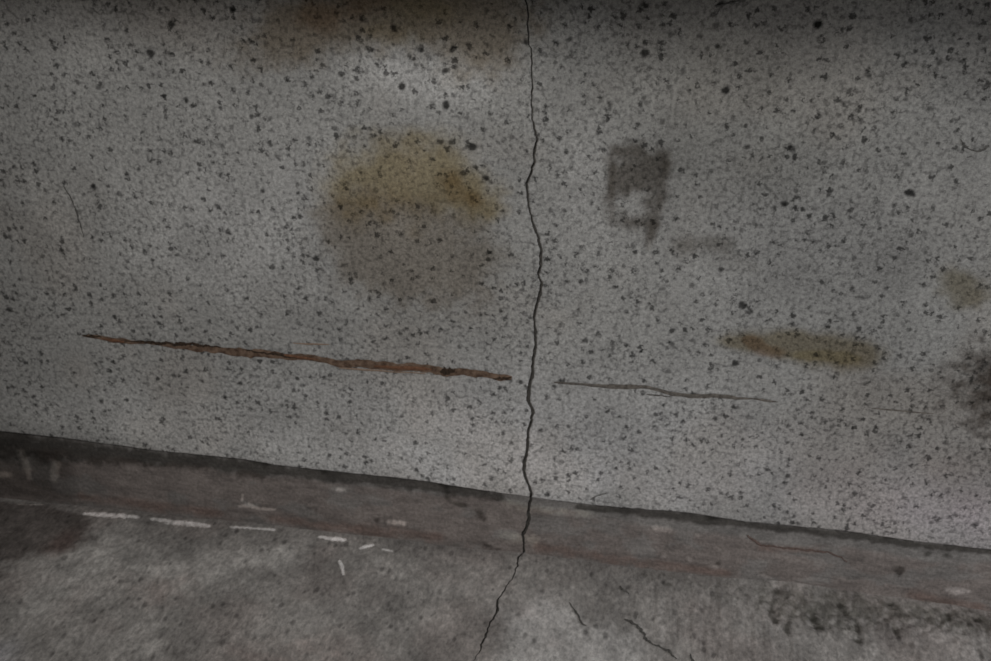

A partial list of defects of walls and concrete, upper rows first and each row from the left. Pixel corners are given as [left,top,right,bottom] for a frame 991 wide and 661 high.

water stain [599,135,762,279]
rust [82,334,512,381]
crack [474,0,777,661]
rust [706,323,896,378]
water stain [921,329,991,477]
water stain [926,258,991,315]